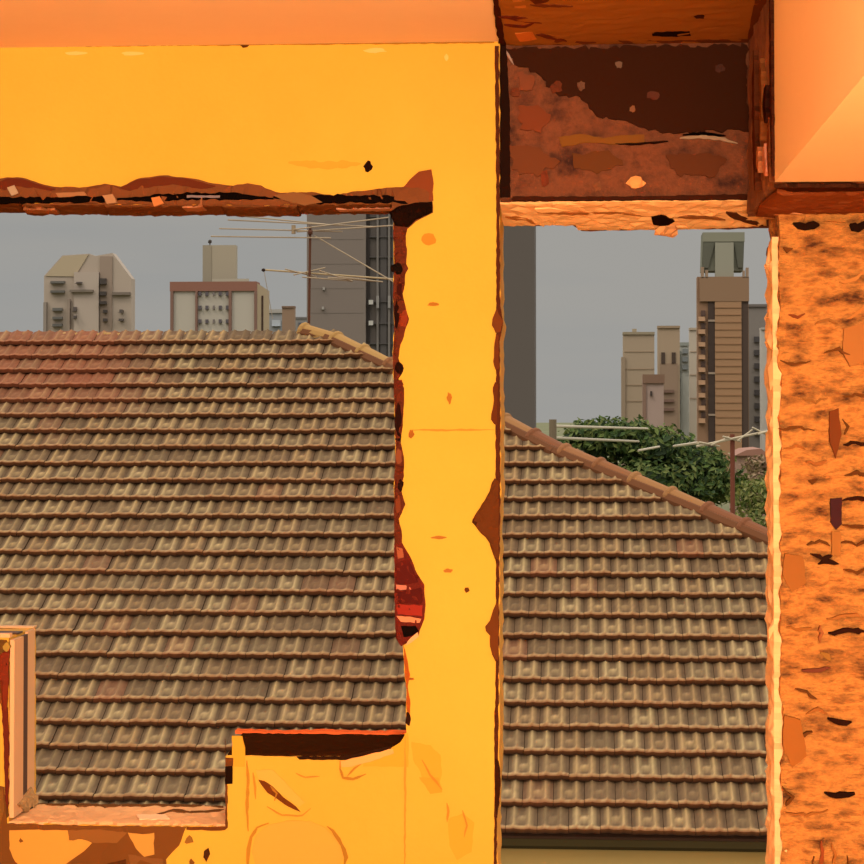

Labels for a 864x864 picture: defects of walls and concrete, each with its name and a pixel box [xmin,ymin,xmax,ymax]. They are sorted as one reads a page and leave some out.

flaking render [0,169,434,646]
flaking render [472,0,864,864]
peeling [0,639,233,864]
flaking render [259,780,300,812]
flaking render [235,712,411,767]